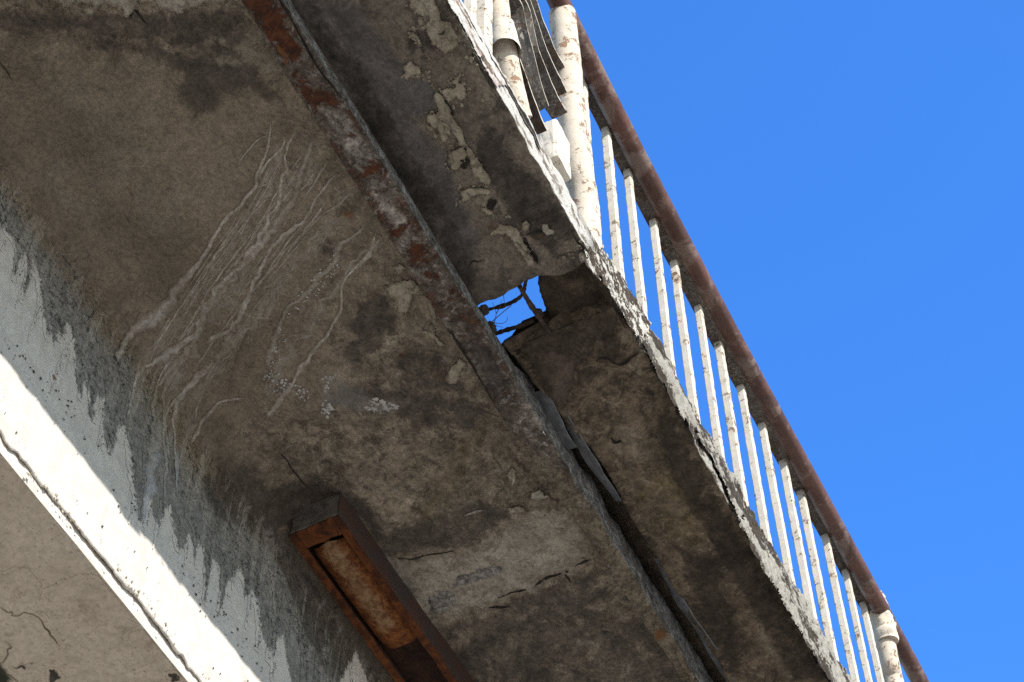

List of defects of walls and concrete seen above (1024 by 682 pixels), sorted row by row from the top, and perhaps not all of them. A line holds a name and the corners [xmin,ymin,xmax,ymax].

rust [244,0,397,213]
peeling [400,0,554,268]
leakage [0,120,354,682]
efflorescence [261,222,412,427]
crack [398,550,455,560]
crack [485,558,591,609]
spalling [579,244,853,682]